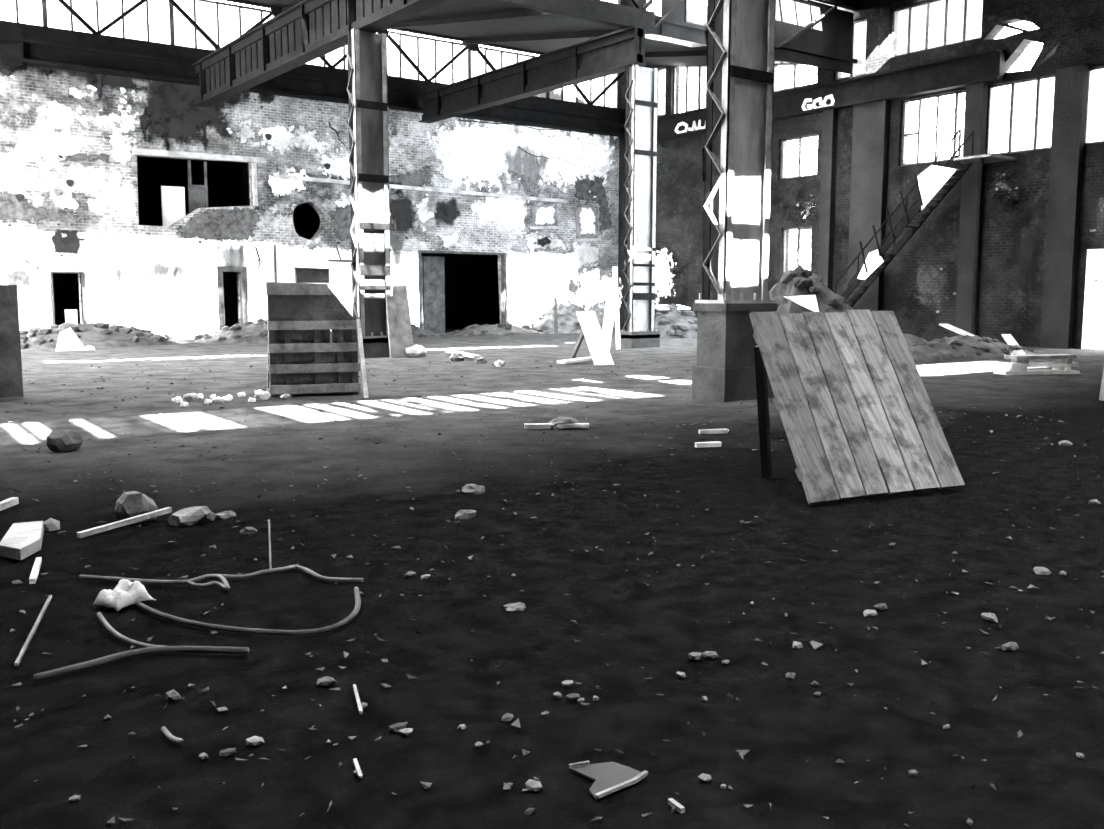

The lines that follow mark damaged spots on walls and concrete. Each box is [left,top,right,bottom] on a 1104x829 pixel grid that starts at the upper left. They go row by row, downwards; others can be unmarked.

peeling [0,85,353,340]
peeling [389,118,623,328]